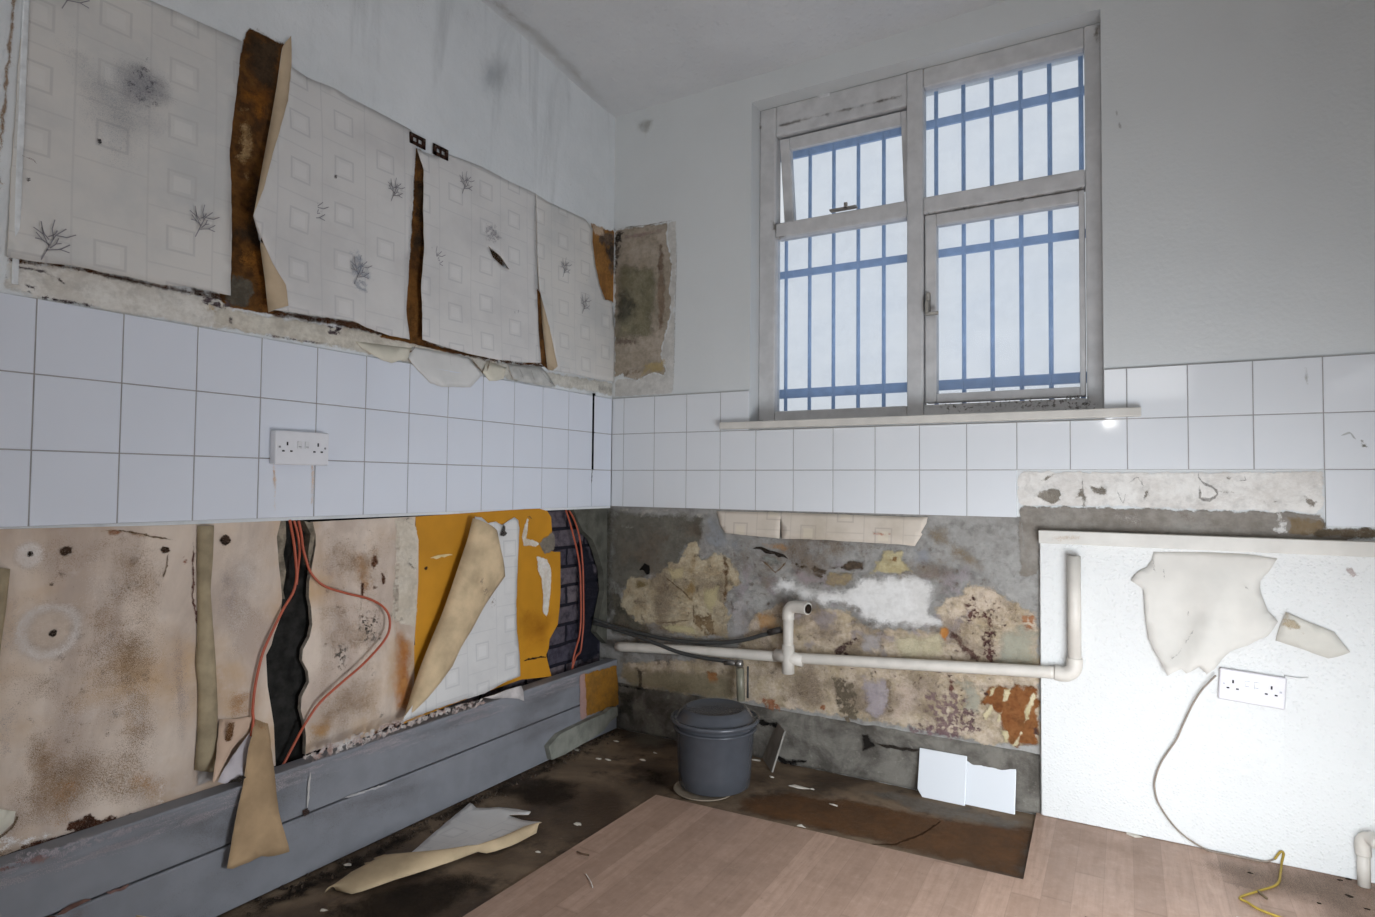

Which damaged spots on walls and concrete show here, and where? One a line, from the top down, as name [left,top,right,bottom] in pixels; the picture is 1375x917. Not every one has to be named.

peeling [3,28,614,396]
water stain [323,561,403,674]
flaking render [303,506,1375,792]
rust [980,684,1041,748]
spalling [0,813,132,856]
peeling [213,717,290,869]